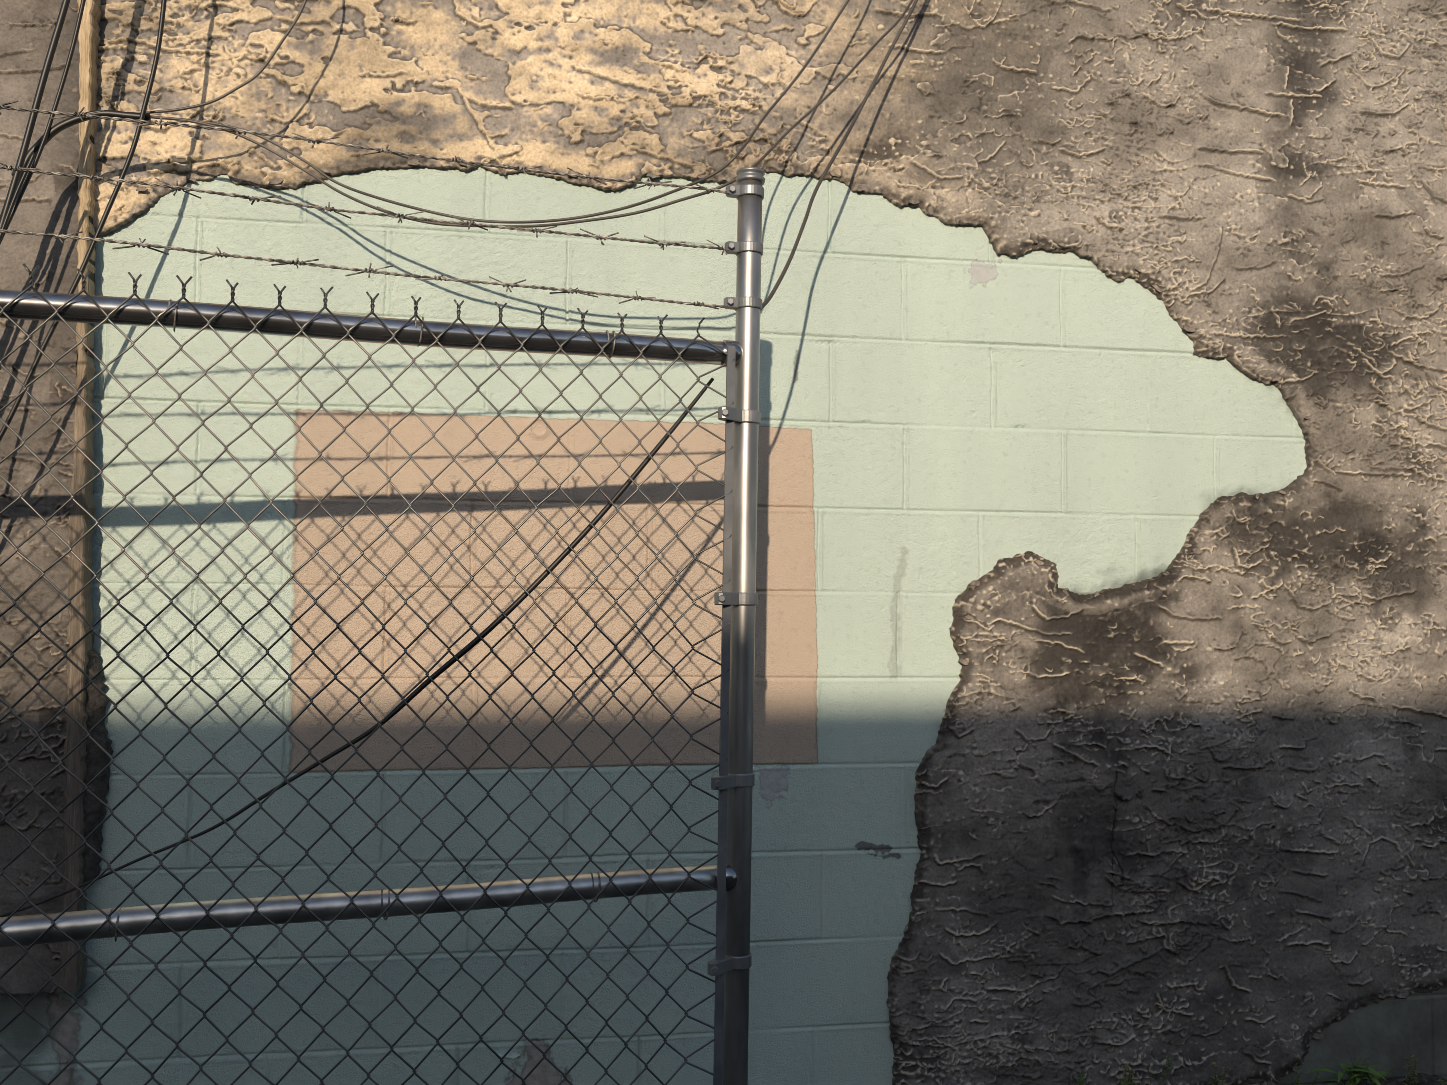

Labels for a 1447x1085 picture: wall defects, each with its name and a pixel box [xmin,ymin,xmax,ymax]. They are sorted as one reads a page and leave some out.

spalling [95,157,737,235]
spalling [756,159,1255,378]
spalling [855,492,1259,1085]
peeling [492,1039,572,1085]